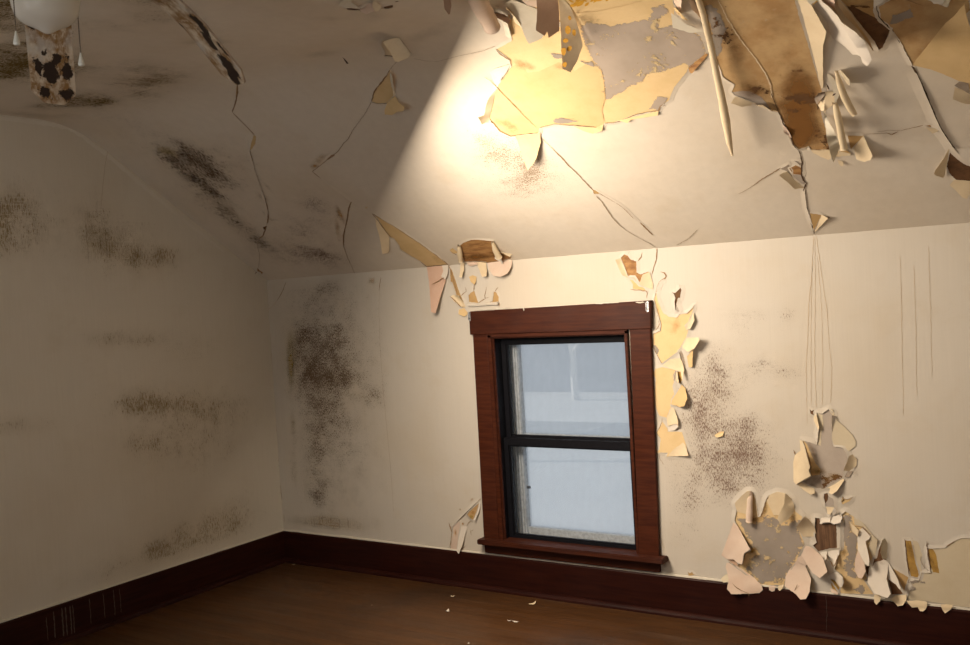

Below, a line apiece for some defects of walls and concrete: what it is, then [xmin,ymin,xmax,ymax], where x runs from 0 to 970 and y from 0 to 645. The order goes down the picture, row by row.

leakage [0,0,30,85]
leakage [713,6,734,48]
flaking render [732,91,770,109]
leakage [749,67,828,150]
leakage [142,136,349,267]
crack [232,85,270,274]
crack [541,138,697,330]
leakage [286,280,387,512]
leakage [667,346,783,541]
flaking render [803,409,847,507]